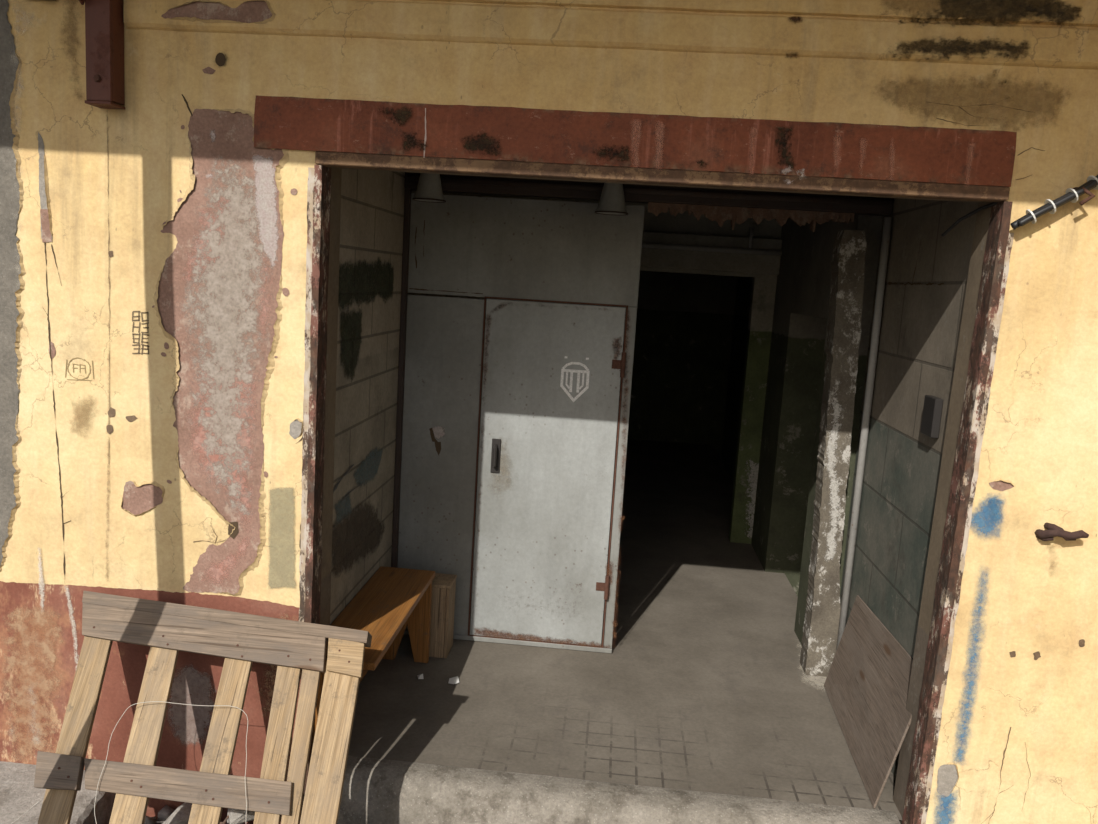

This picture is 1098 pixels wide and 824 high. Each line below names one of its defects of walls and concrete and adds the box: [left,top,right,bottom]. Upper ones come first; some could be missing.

peeling [161,0,276,24]
water stain [893,0,1081,60]
peeling [15,240,26,390]
peeling [121,108,297,596]
water stain [338,258,394,379]
peeling [0,414,22,572]
peeling [825,403,842,560]
crack [981,727,1031,824]